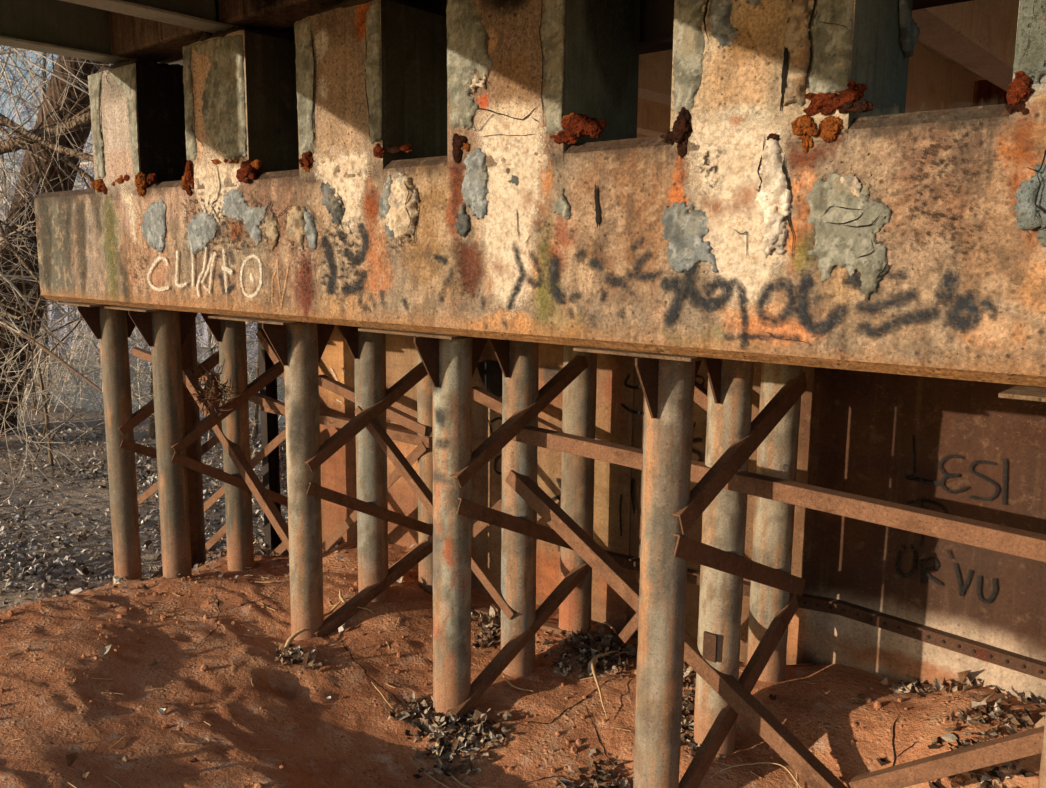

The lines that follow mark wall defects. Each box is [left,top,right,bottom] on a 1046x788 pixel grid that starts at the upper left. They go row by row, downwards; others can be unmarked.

peeling [673,0,760,110]
peeling [780,0,854,111]
peeling [1013,0,1046,84]
peeling [184,182,363,301]
spalling [454,147,489,297]
spalling [661,201,719,273]
spalling [756,135,792,258]
spalling [805,173,892,301]
spalling [901,121,982,258]
peeling [1012,150,1046,247]